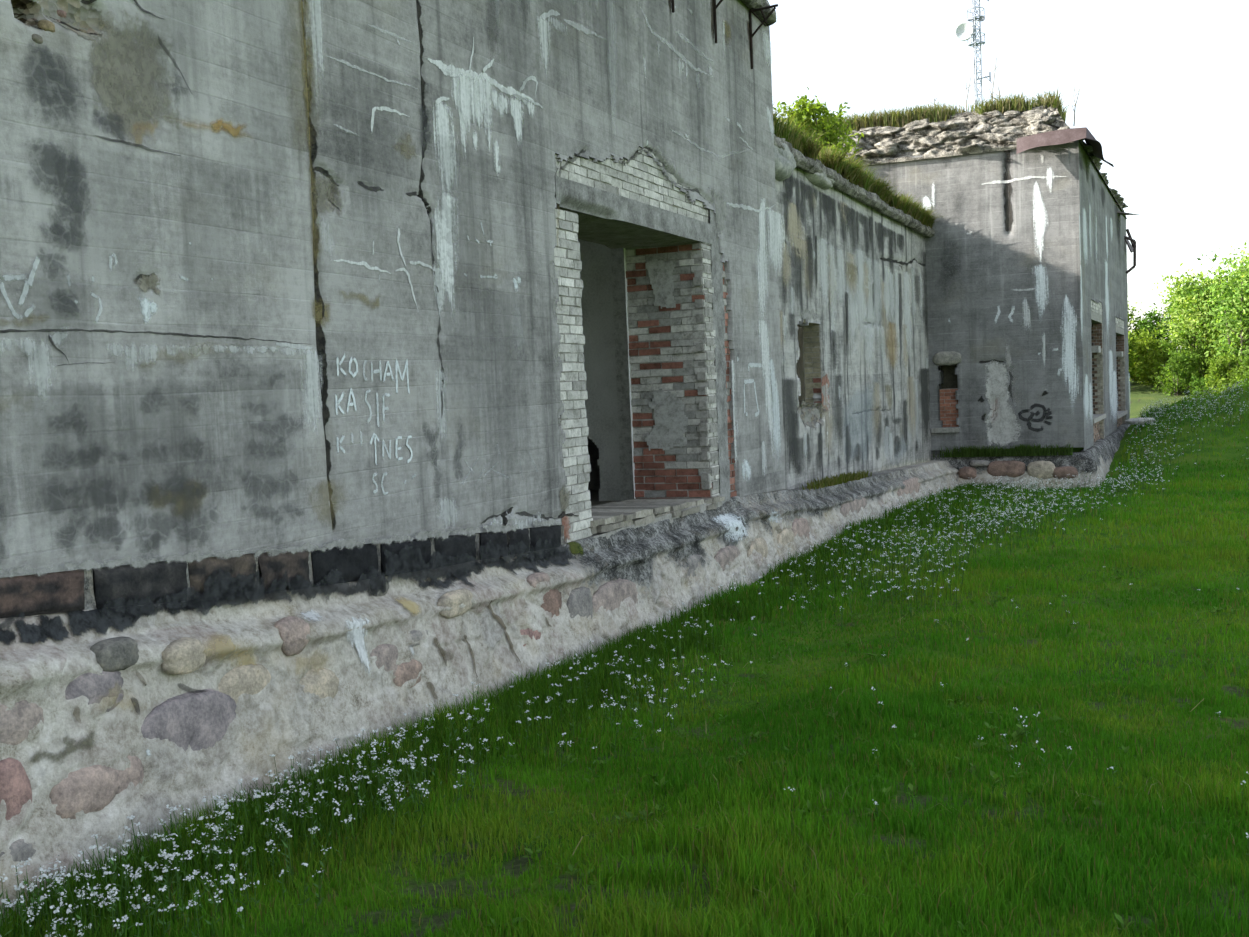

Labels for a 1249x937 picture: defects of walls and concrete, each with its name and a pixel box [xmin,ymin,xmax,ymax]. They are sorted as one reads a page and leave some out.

spalling [11,0,110,44]
leakage [35,145,86,246]
crack [0,0,444,530]
corrosion [212,120,242,137]
leakage [428,10,567,315]
leakage [727,174,930,478]
flaking render [978,346,1021,446]
crack [982,143,1066,231]
leakage [1023,168,1053,327]
leakage [1060,208,1092,417]
leakage [1068,147,1120,328]
efflorescence [1108,351,1130,417]